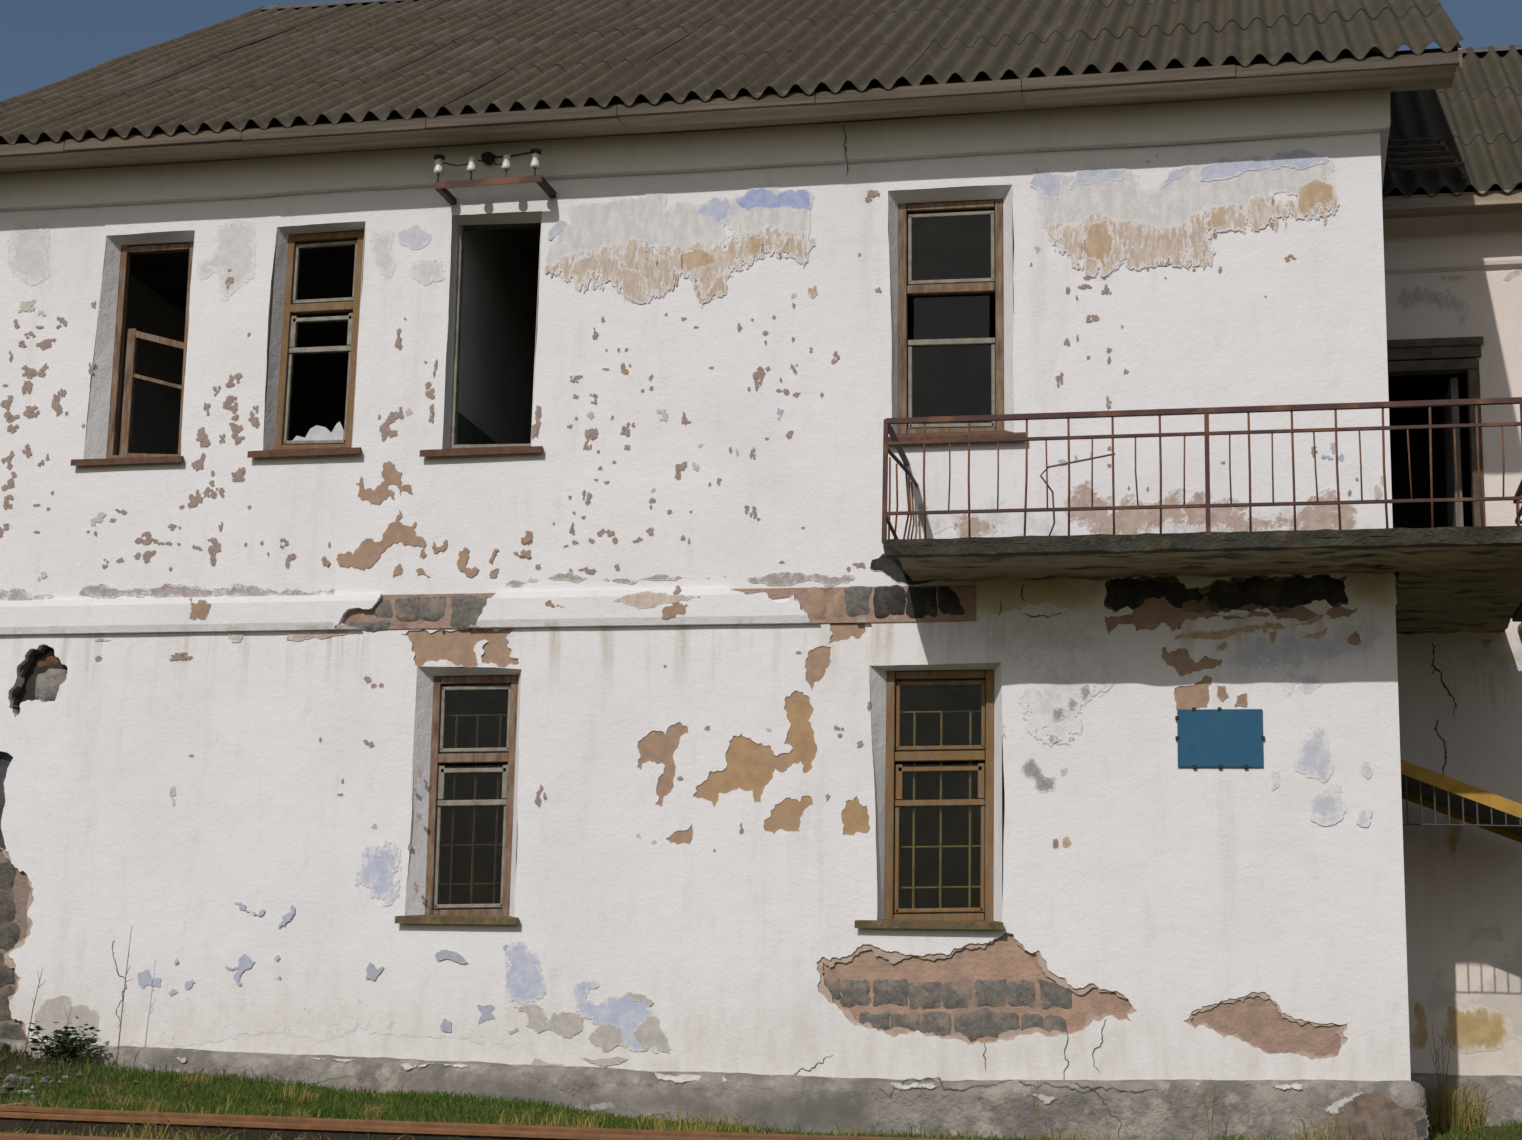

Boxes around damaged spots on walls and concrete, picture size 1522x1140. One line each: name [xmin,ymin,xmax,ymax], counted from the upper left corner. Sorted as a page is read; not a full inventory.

peeling [544,185,818,328]
peeling [1029,148,1340,300]
peeling [0,299,69,537]
peeling [102,373,260,569]
peeling [286,461,541,641]
spalling [12,645,68,715]
peeling [637,562,976,835]
crack [1431,644,1457,775]
flaking render [0,751,32,953]
peeling [0,995,99,1044]
flaking render [822,934,1131,1043]
flaking render [1191,996,1343,1056]